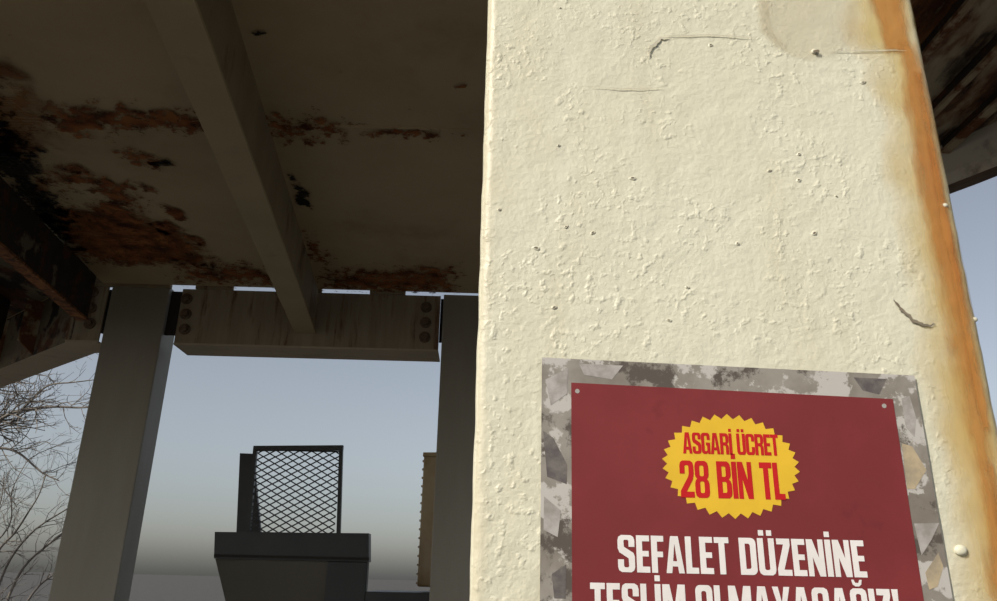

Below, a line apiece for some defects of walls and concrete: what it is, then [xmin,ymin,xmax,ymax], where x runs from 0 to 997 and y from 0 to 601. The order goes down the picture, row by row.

rust [0,64,204,160]
rust [266,106,440,146]
rust [17,163,275,289]
rust [288,174,313,210]
rust [302,230,465,293]
rust [865,0,997,601]